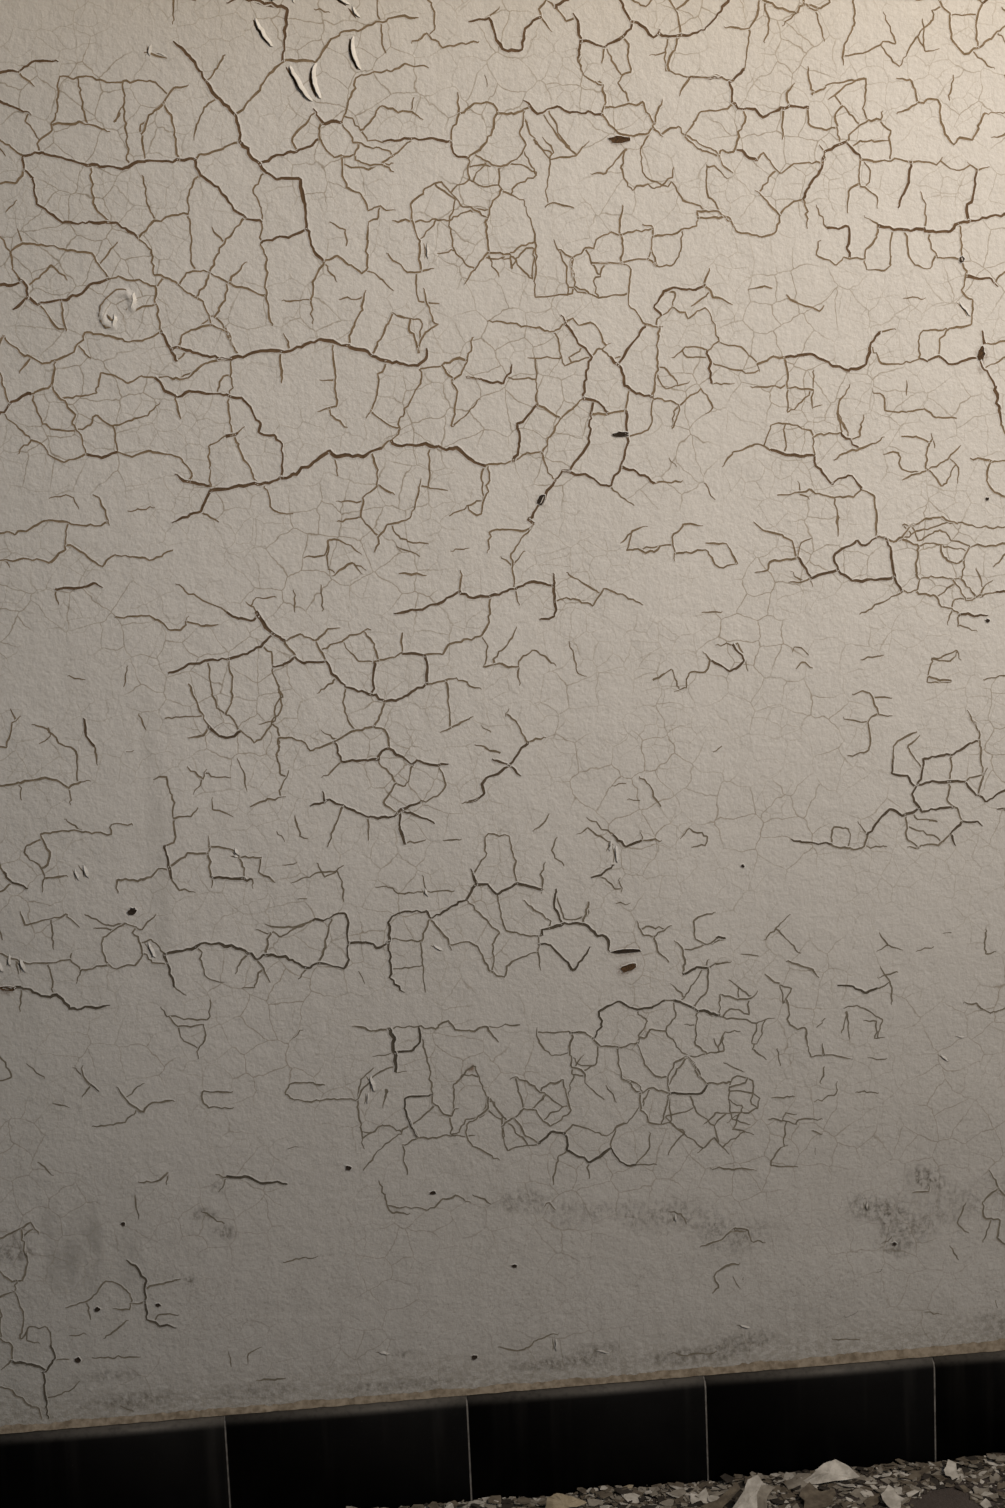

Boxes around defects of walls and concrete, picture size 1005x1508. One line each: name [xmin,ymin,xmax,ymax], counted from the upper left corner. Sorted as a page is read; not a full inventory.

peeling [253,0,295,47]
peeling [286,63,322,101]
peeling [348,36,361,70]
crack [0,0,1005,1059]
crack [283,817,952,1215]
crack [0,1056,234,1127]
crack [134,1172,169,1220]
crack [201,1146,299,1224]
crack [668,1211,766,1294]
crack [950,1170,1005,1260]
crack [0,1221,181,1420]
crack [500,1333,559,1352]